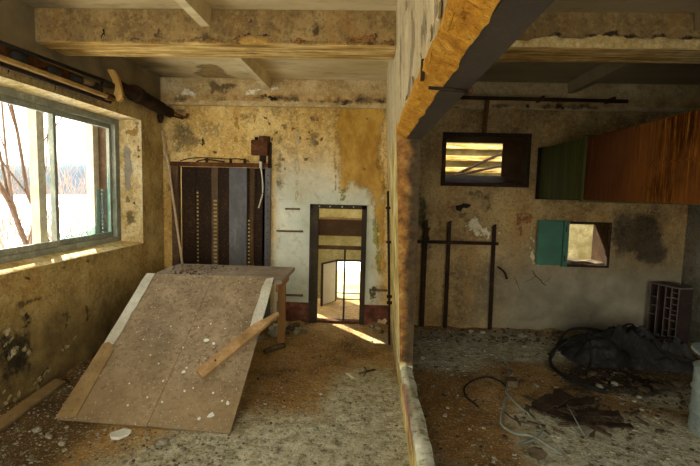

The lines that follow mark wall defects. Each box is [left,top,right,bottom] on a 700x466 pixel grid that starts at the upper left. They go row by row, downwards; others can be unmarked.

water stain [194,64,236,101]
water stain [257,94,299,102]
peeling [465,217,500,239]